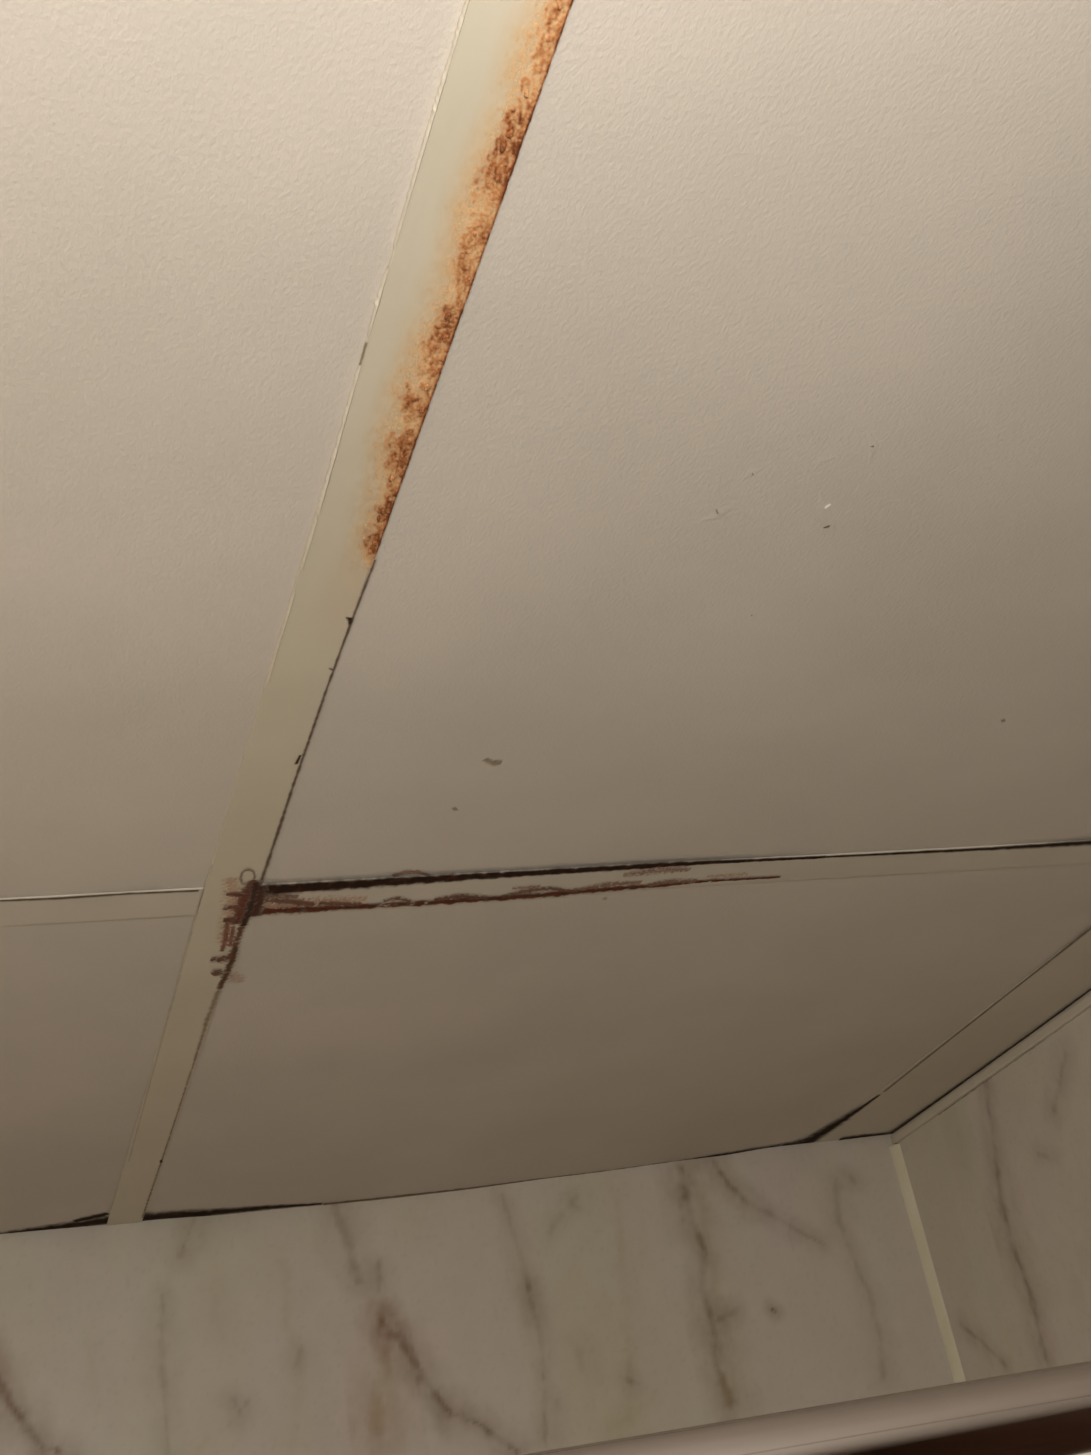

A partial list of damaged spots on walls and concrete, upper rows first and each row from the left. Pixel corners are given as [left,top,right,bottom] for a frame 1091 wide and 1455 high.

rust [360,0,573,567]
rust [210,856,826,989]